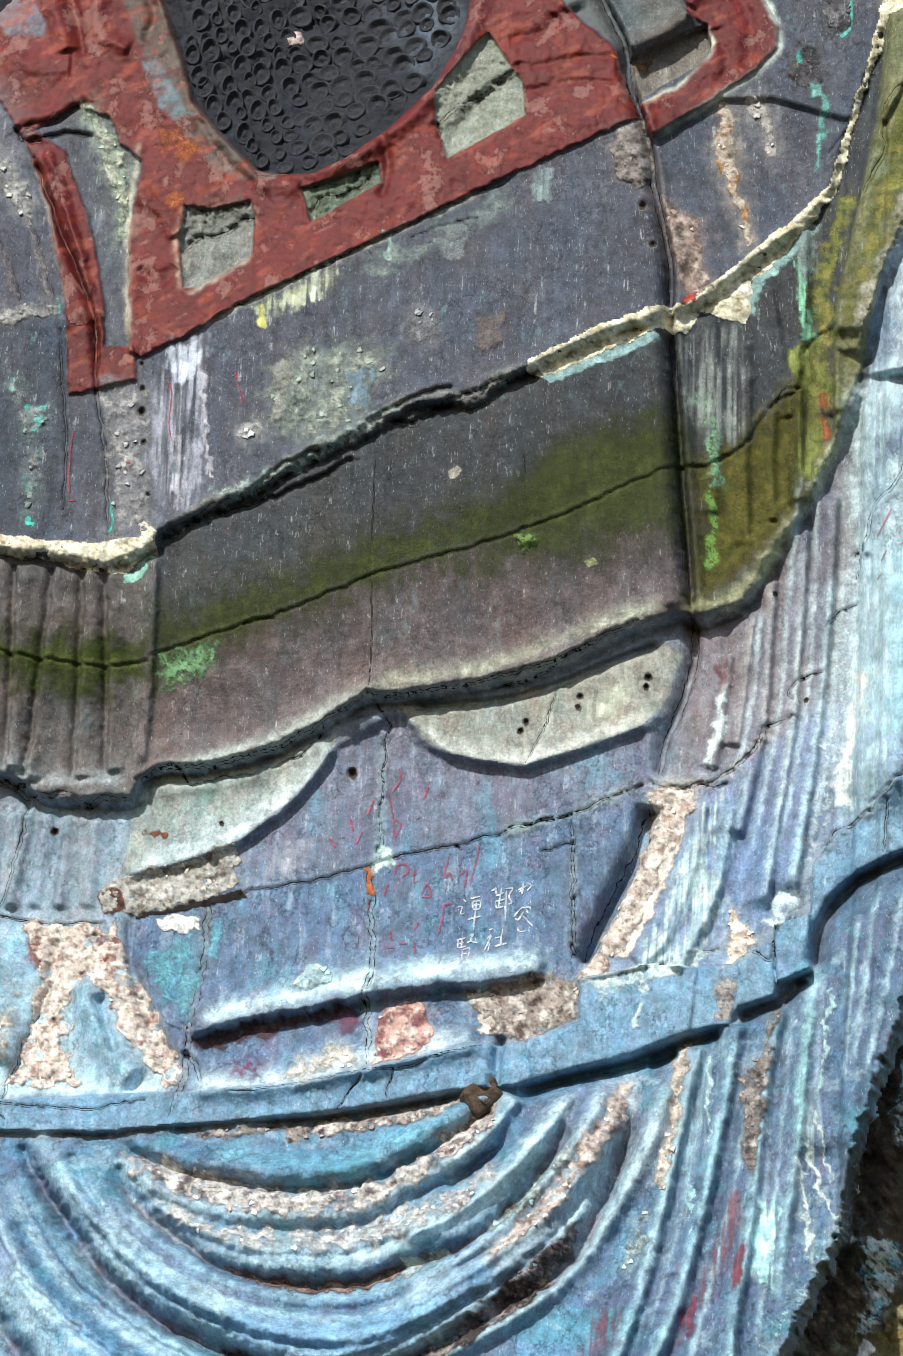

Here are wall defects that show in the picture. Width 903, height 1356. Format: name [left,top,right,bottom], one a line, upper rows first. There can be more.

spalling [608,120,655,188]
crack [826,464,903,625]
crack [821,774,903,854]
spalling [0,843,247,1089]
spalling [127,1096,496,1294]
spalling [278,1001,434,1081]
spalling [489,1083,633,1256]
spalling [463,786,696,1041]
spalling [738,1010,780,1173]
spalling [417,1221,580,1356]